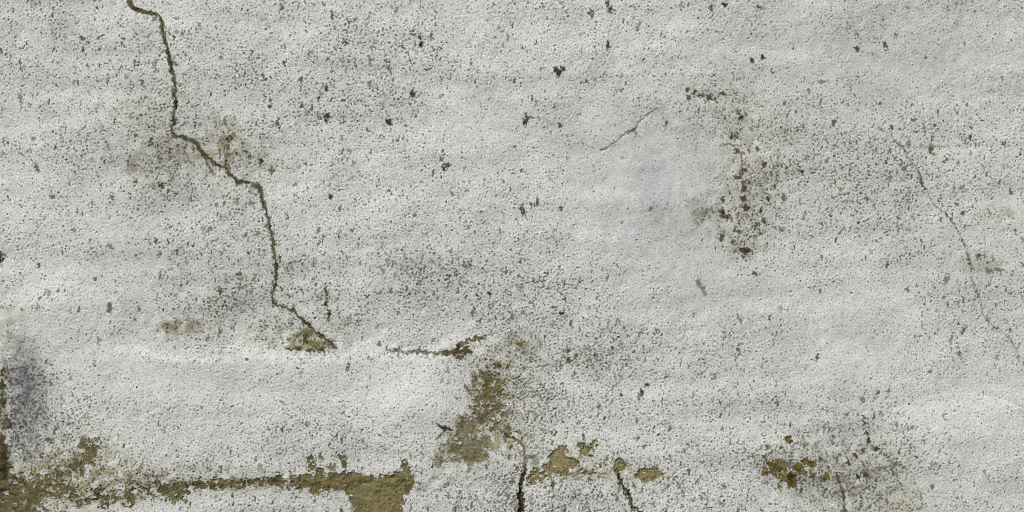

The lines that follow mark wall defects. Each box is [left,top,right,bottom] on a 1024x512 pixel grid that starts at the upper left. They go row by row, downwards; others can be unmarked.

crack [127,0,337,349]
crack [389,335,487,356]
peeling [434,362,520,468]
peeling [0,436,415,512]
crack [498,429,536,512]
peeling [526,440,599,486]
crack [615,471,643,512]
peeling [613,458,664,483]